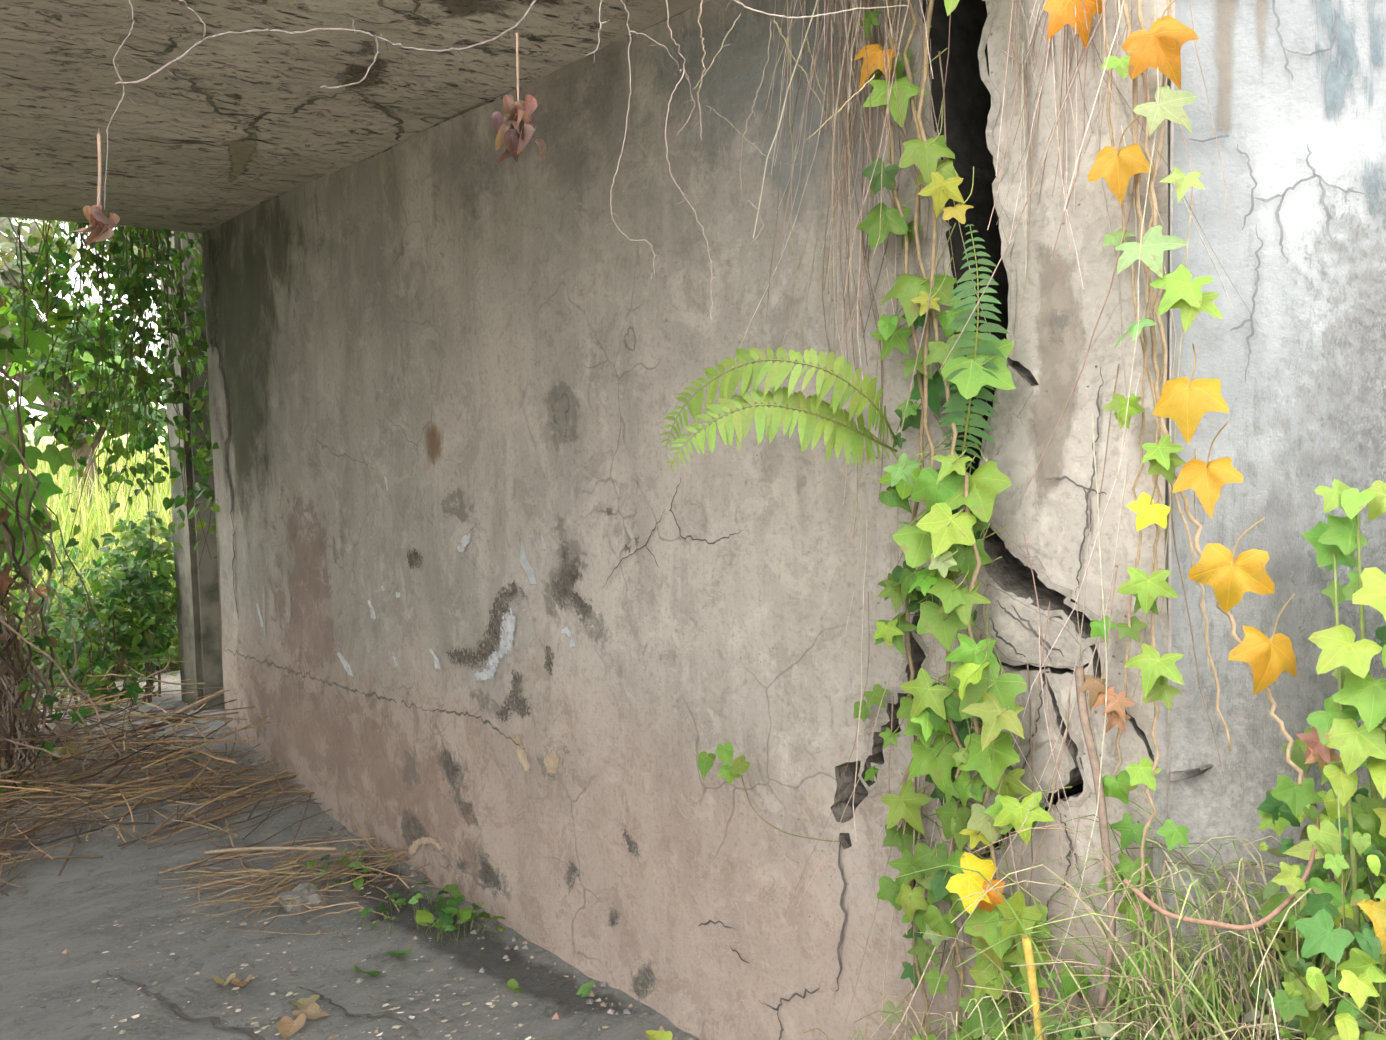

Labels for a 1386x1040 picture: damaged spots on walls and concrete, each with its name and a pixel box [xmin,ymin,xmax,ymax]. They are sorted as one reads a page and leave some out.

crack [1272,0,1337,81]
damp [1312,0,1384,118]
crack [1189,135,1364,382]
crack [206,239,525,750]
crack [605,478,742,585]
crack [913,0,1214,921]
crack [858,587,933,792]
spalling [830,760,877,850]
crack [698,920,750,964]
crack [761,839,847,1040]
crack [106,970,265,1040]
crack [296,985,417,1030]